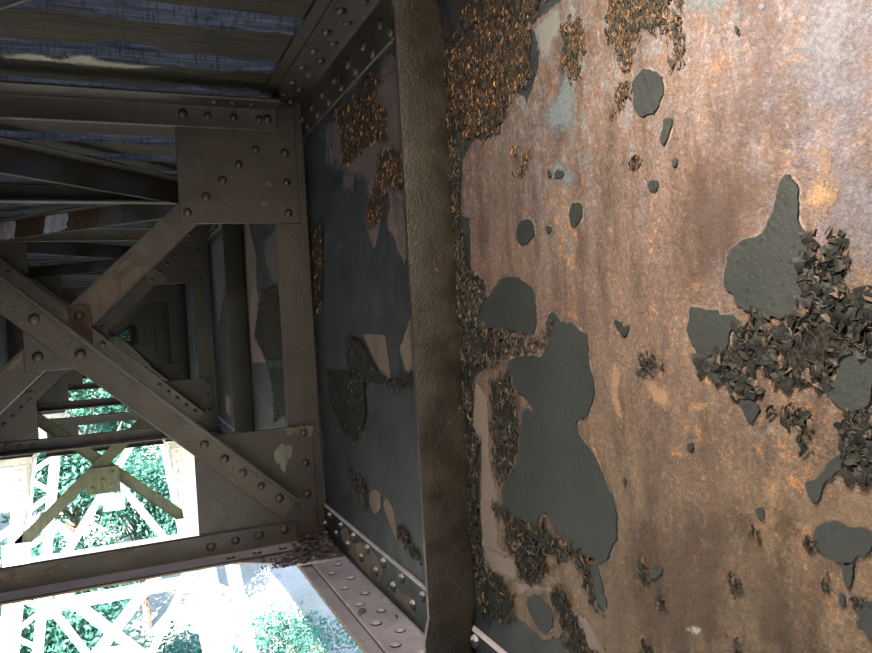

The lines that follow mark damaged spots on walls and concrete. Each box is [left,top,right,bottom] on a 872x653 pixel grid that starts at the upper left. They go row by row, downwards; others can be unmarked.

rust [329,67,403,196]
peeling [325,71,407,263]
rust [805,183,835,207]
peeling [245,224,313,473]
peeling [363,333,391,379]
peeling [400,318,413,376]
rust [610,361,623,421]
peeling [442,0,872,653]
rust [646,381,672,411]
peeling [369,489,424,566]
rust [755,467,783,537]